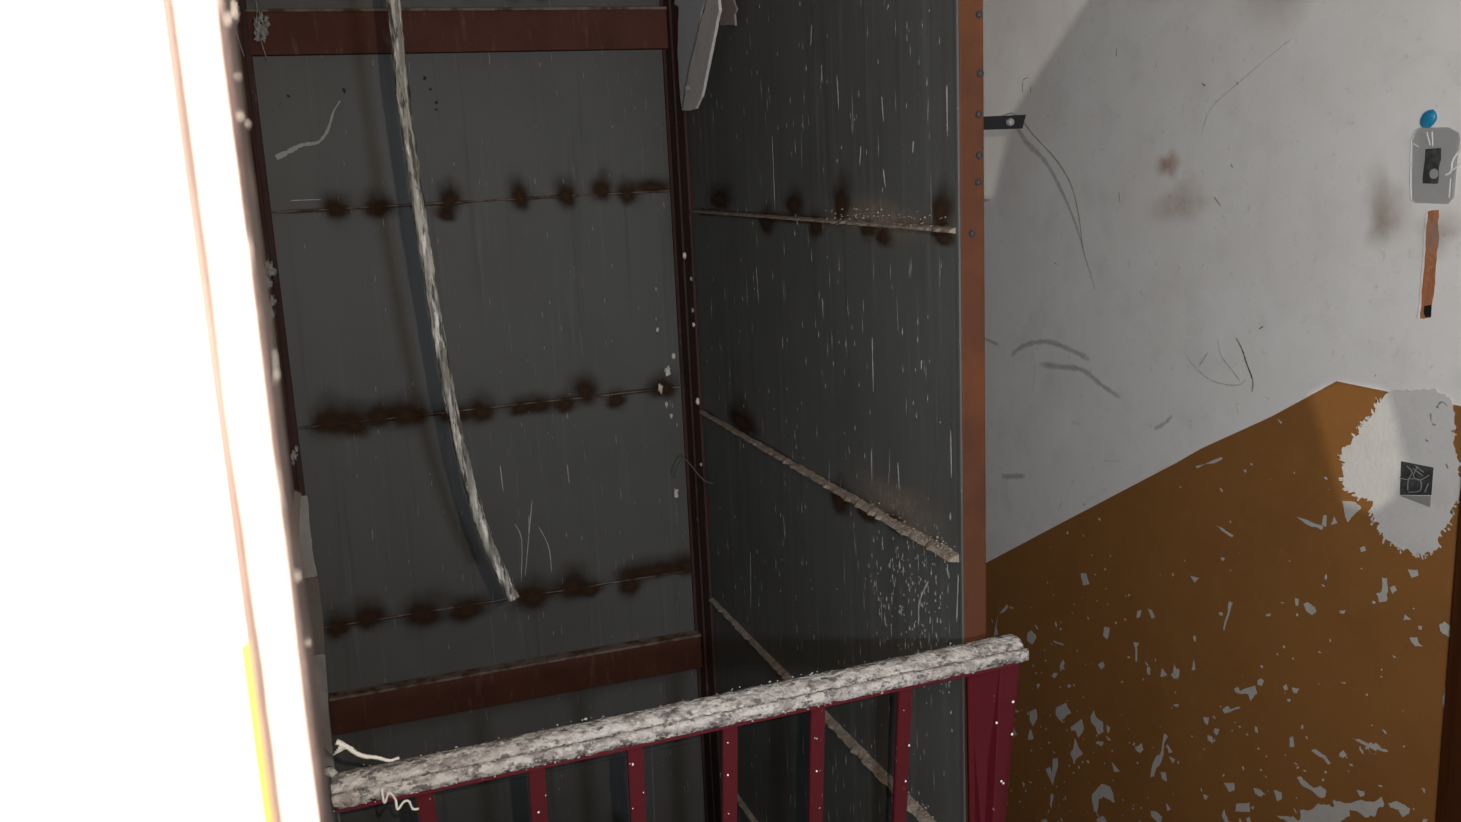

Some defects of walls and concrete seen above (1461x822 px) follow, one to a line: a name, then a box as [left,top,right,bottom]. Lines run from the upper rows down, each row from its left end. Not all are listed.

corrosion [293,197,404,216]
corrosion [503,185,576,206]
corrosion [594,180,666,203]
corrosion [862,198,951,245]
corrosion [315,380,672,433]
peeling [1297,389,1461,578]
corrosion [328,560,691,636]
peeling [1372,578,1397,604]
peeling [1404,608,1450,646]
peeling [1127,642,1195,709]
peeling [1007,594,1179,822]
peeling [1192,665,1427,822]